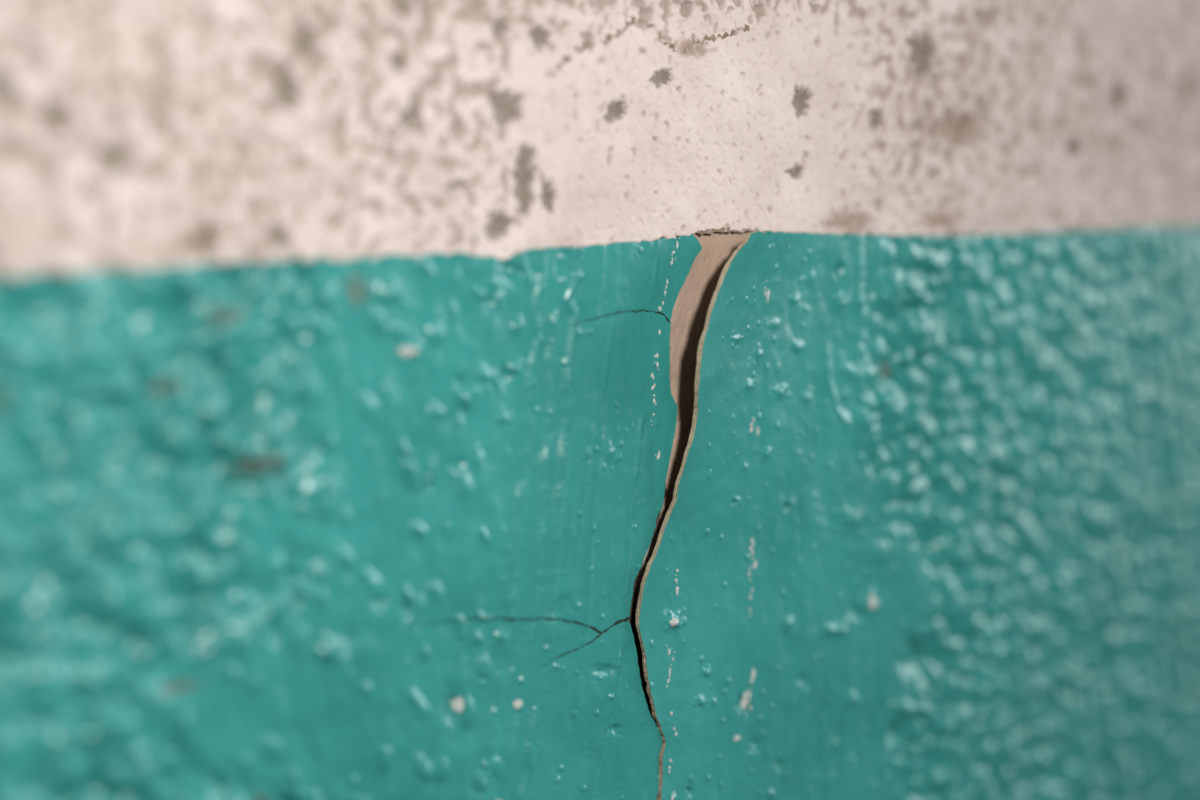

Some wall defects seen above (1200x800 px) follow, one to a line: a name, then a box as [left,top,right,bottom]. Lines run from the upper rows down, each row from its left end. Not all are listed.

crack [575,309,670,325]
crack [412,483,666,744]